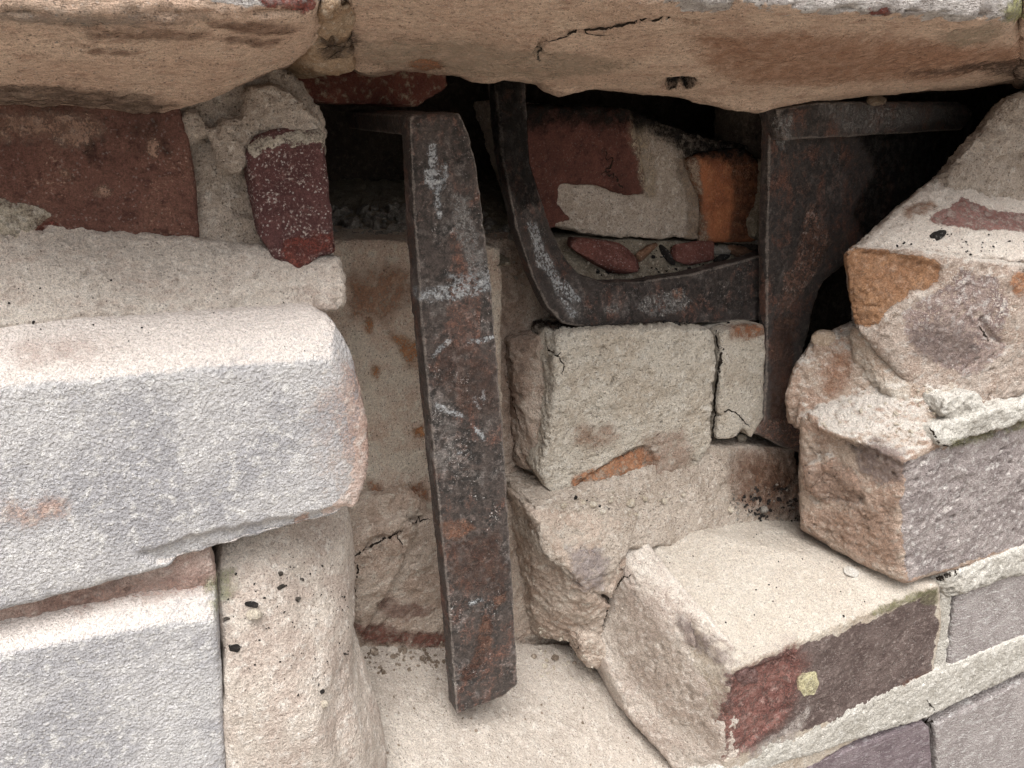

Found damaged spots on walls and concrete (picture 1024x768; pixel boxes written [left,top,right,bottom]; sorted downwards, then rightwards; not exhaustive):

crack [535,16,698,62]
crack [712,330,750,438]
corrosion [729,204,830,520]
crack [354,516,430,598]